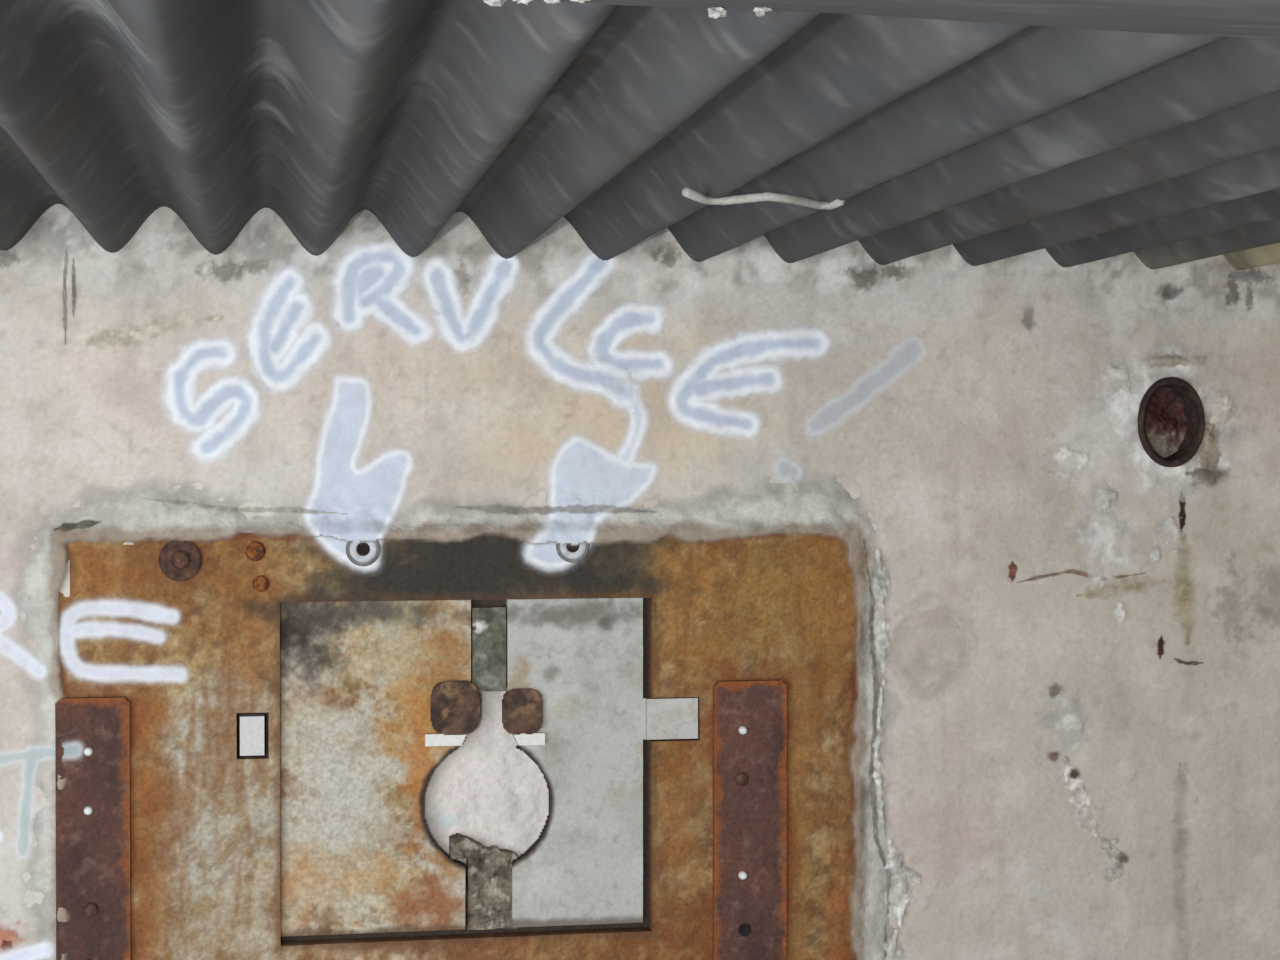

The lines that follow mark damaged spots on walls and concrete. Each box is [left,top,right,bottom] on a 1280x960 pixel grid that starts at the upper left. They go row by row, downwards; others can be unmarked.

crack [863,539,891,960]